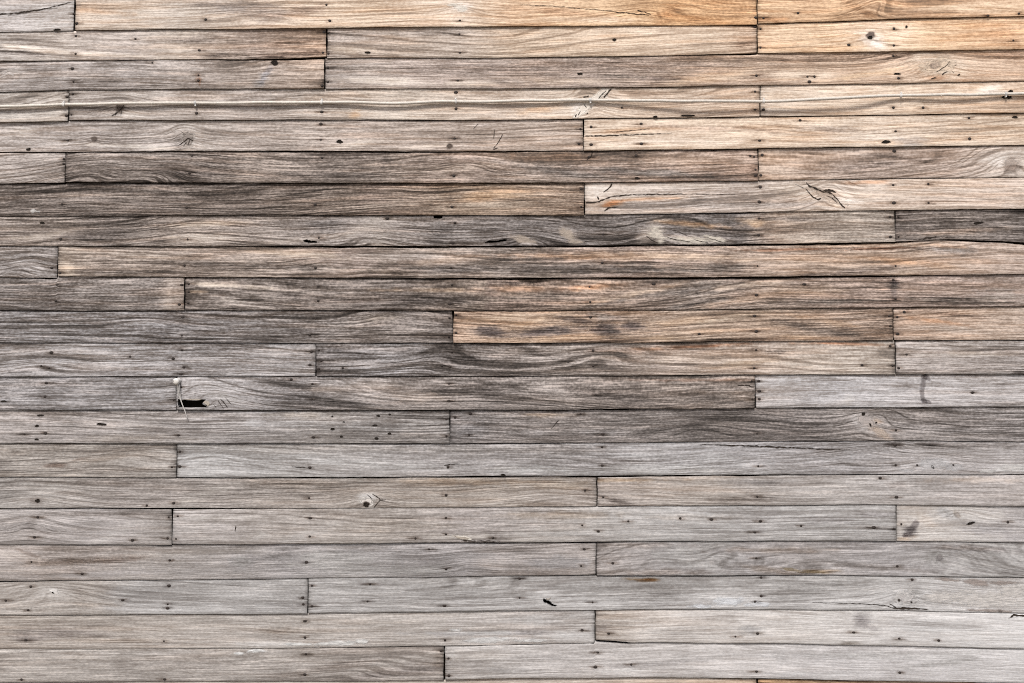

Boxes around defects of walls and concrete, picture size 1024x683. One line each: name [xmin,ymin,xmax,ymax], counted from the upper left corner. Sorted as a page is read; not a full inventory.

crack [575,89,669,160]
crack [586,184,686,211]
crack [796,182,845,208]